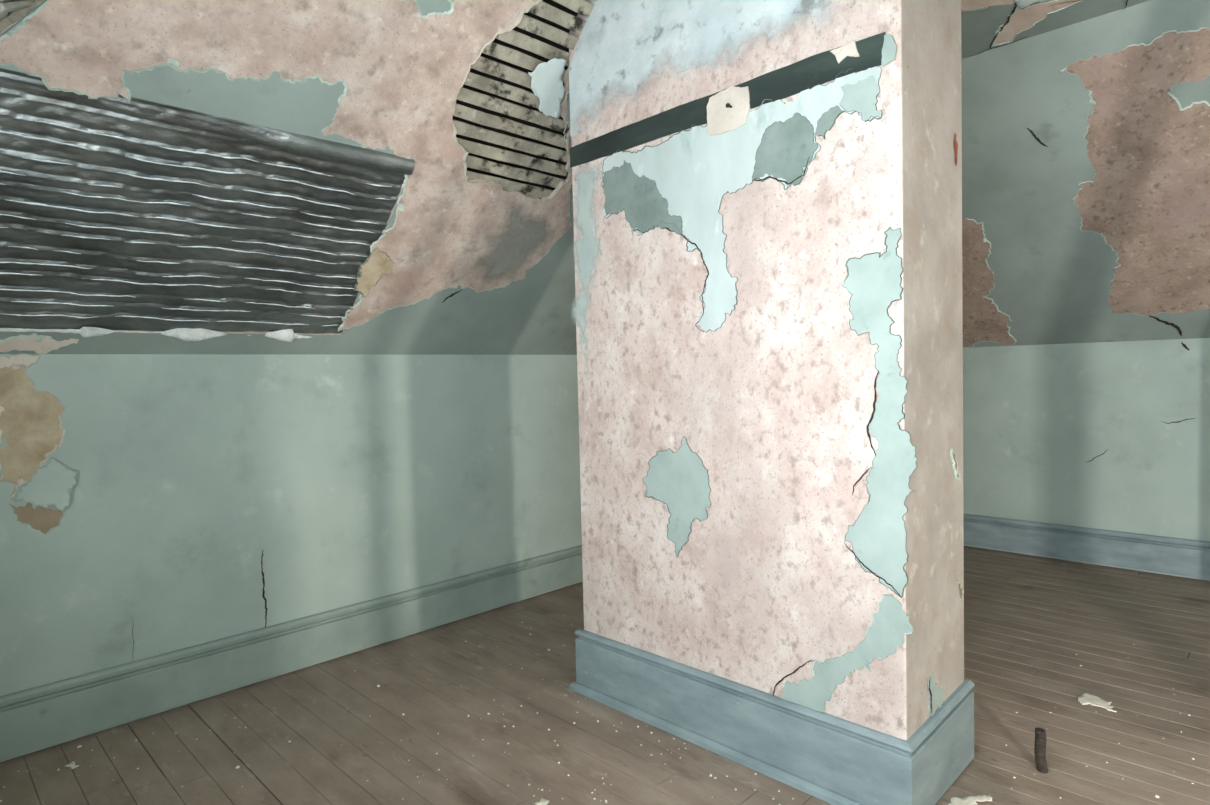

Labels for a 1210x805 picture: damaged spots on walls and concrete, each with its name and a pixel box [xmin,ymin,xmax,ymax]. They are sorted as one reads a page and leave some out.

peeling [961,0,1083,46]
peeling [0,0,883,342]
peeling [1060,27,1210,317]
peeling [962,218,1017,348]
peeling [0,333,79,536]
crack [852,370,879,495]
crack [260,550,268,627]
crack [844,542,901,597]